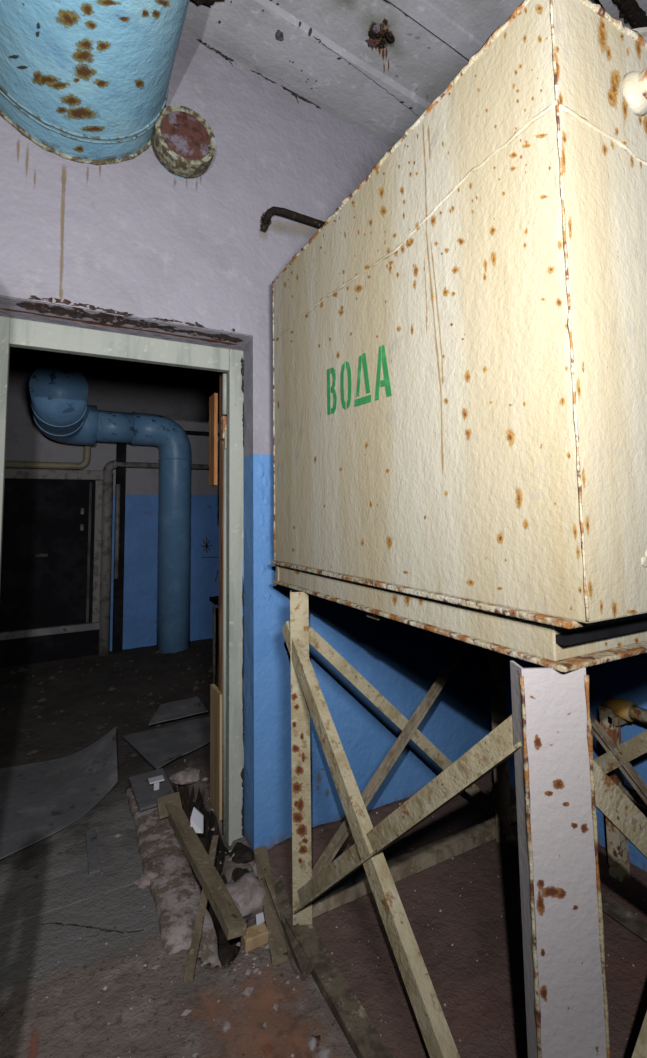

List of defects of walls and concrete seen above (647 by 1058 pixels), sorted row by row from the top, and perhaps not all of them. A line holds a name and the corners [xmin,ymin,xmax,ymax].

peeling [0,295,243,345]